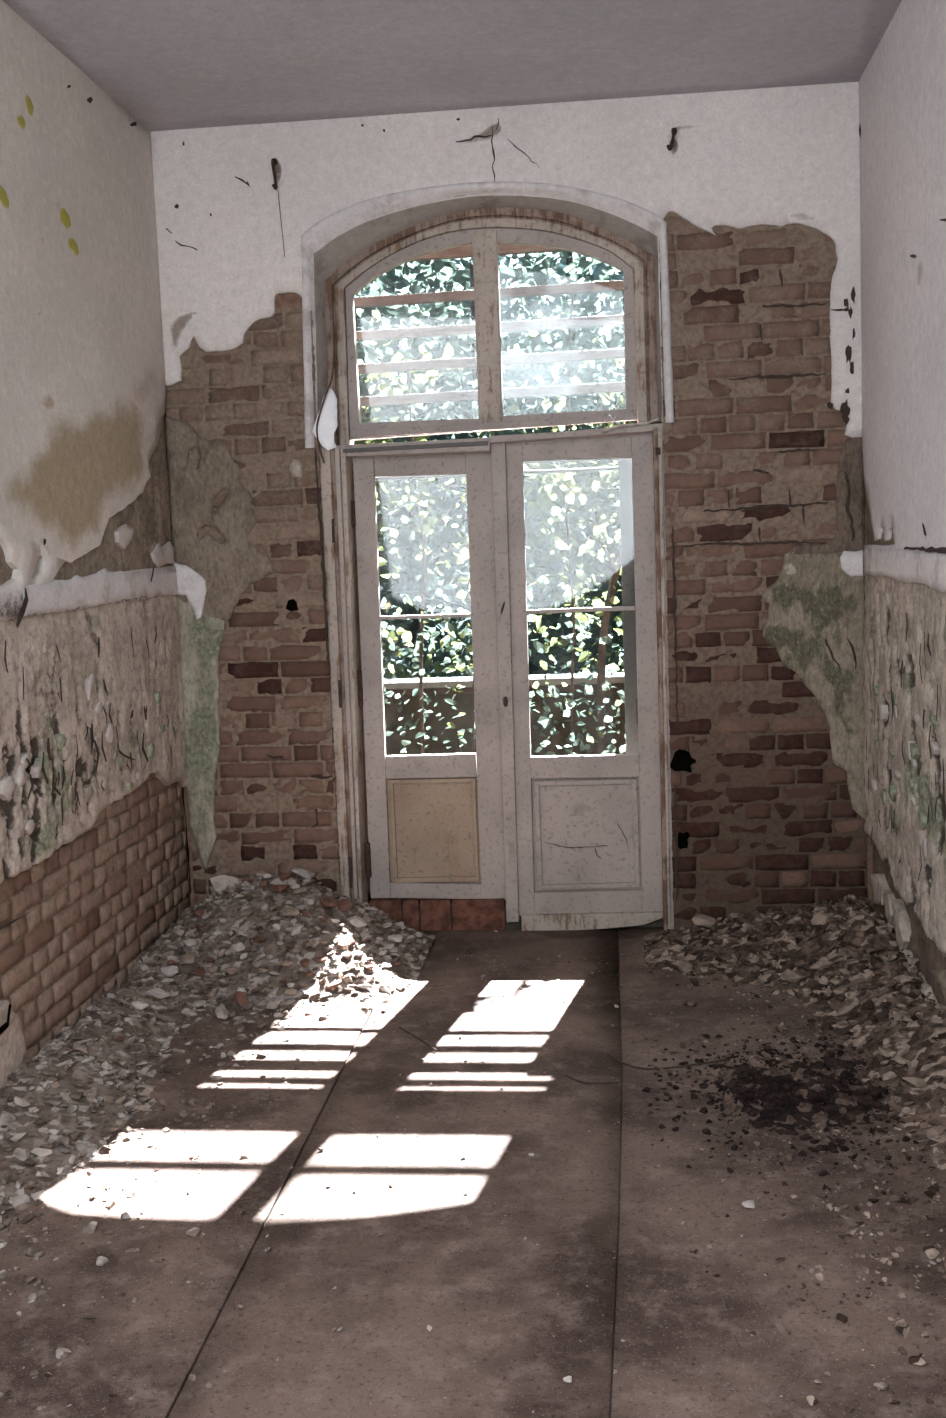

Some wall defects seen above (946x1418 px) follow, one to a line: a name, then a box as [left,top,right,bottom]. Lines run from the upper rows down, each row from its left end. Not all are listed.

crack [456,119,540,182]
leakage [170,312,197,352]
leakage [0,358,160,563]
flaking render [0,307,341,1089]
flaking render [659,212,946,1005]